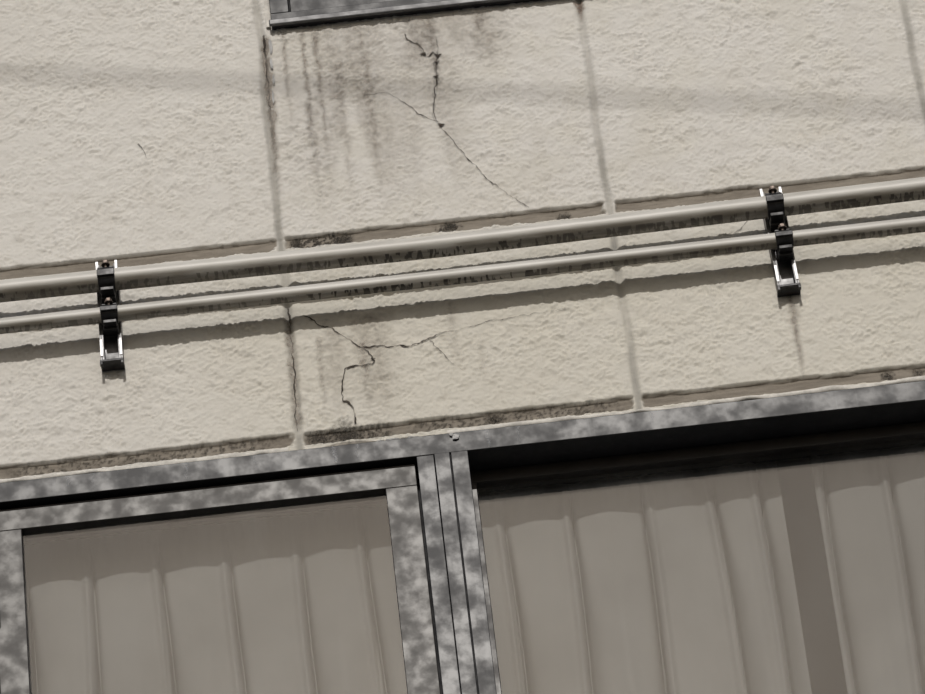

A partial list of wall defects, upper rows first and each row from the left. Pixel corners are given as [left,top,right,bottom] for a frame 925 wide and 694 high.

leakage [262,39,277,145]
crack [373,34,497,185]
crack [287,309,550,430]